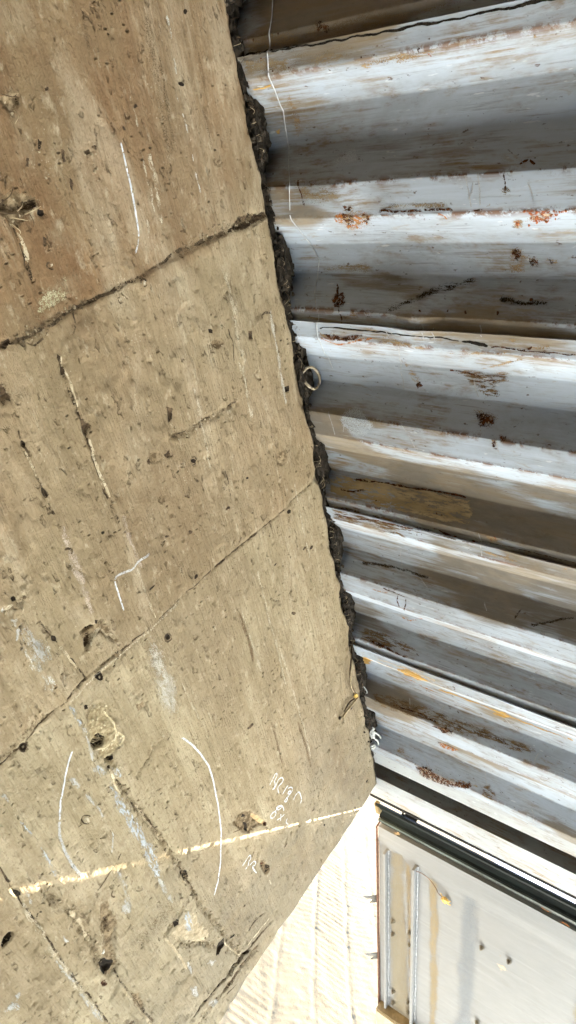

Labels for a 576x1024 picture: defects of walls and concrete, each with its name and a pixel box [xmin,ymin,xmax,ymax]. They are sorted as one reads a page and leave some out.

rust [330,206,453,230]
rust [513,207,570,229]
crack [0,206,275,525]
rust [450,339,549,450]
crack [0,482,324,765]
rust [432,726,458,751]
rust [415,765,497,801]
rust [363,657,573,741]
crack [0,854,155,1024]
crack [108,773,270,1024]